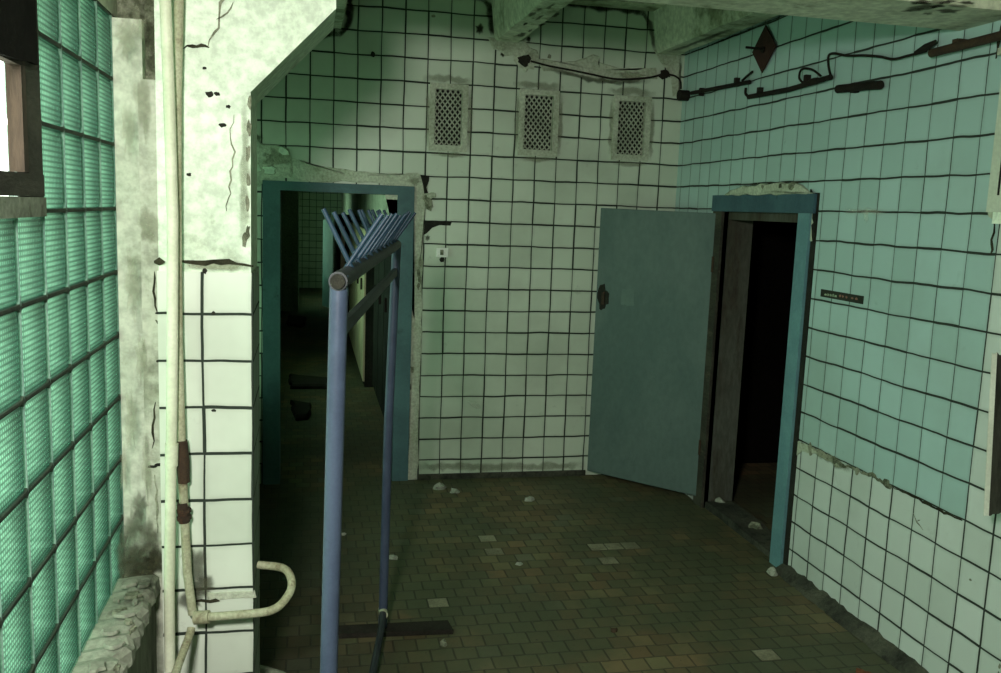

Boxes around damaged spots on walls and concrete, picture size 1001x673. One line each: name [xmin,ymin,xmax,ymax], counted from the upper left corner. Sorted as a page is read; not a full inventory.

crack [183,0,233,49]
water stain [325,0,354,38]
water stain [476,0,494,34]
spalling [797,441,962,521]